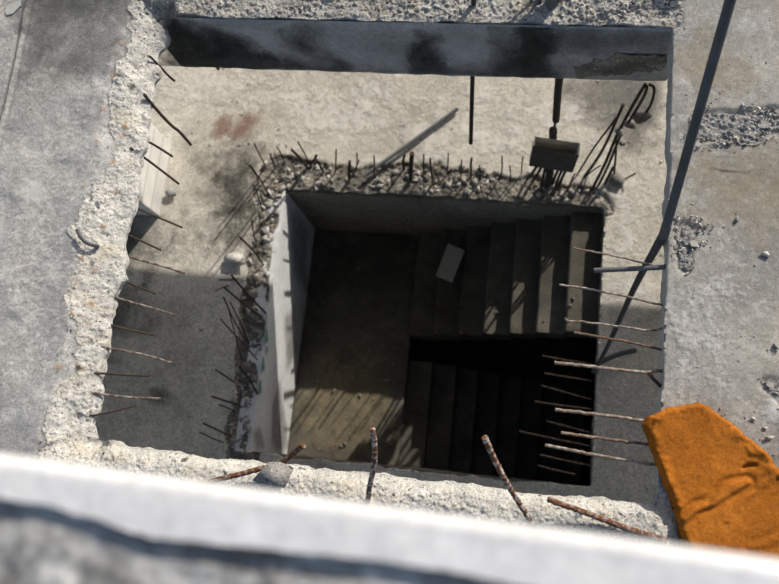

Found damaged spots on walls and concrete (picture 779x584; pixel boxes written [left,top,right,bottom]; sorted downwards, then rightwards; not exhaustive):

water stain [151,9,644,172]
spalling [696,102,779,149]
spalling [33,0,683,545]
water stain [579,159,657,367]
spalling [671,214,715,278]